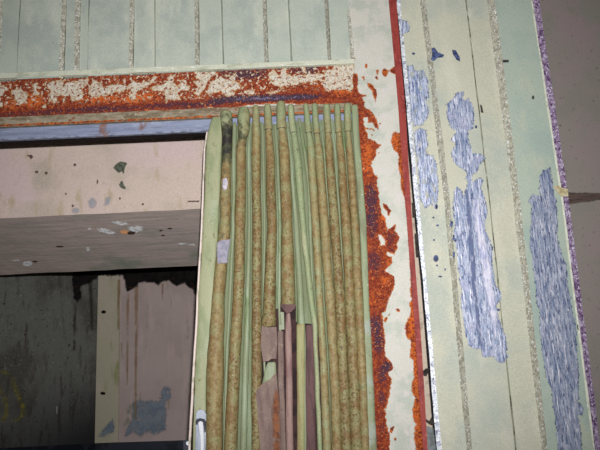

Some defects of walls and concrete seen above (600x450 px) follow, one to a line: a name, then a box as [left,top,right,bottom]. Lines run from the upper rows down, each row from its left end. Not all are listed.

rust [0,58,400,450]
rust [391,132,405,197]
rust [405,279,423,450]
peeling [407,65,438,209]
peeling [446,91,508,363]
peeling [529,167,584,450]